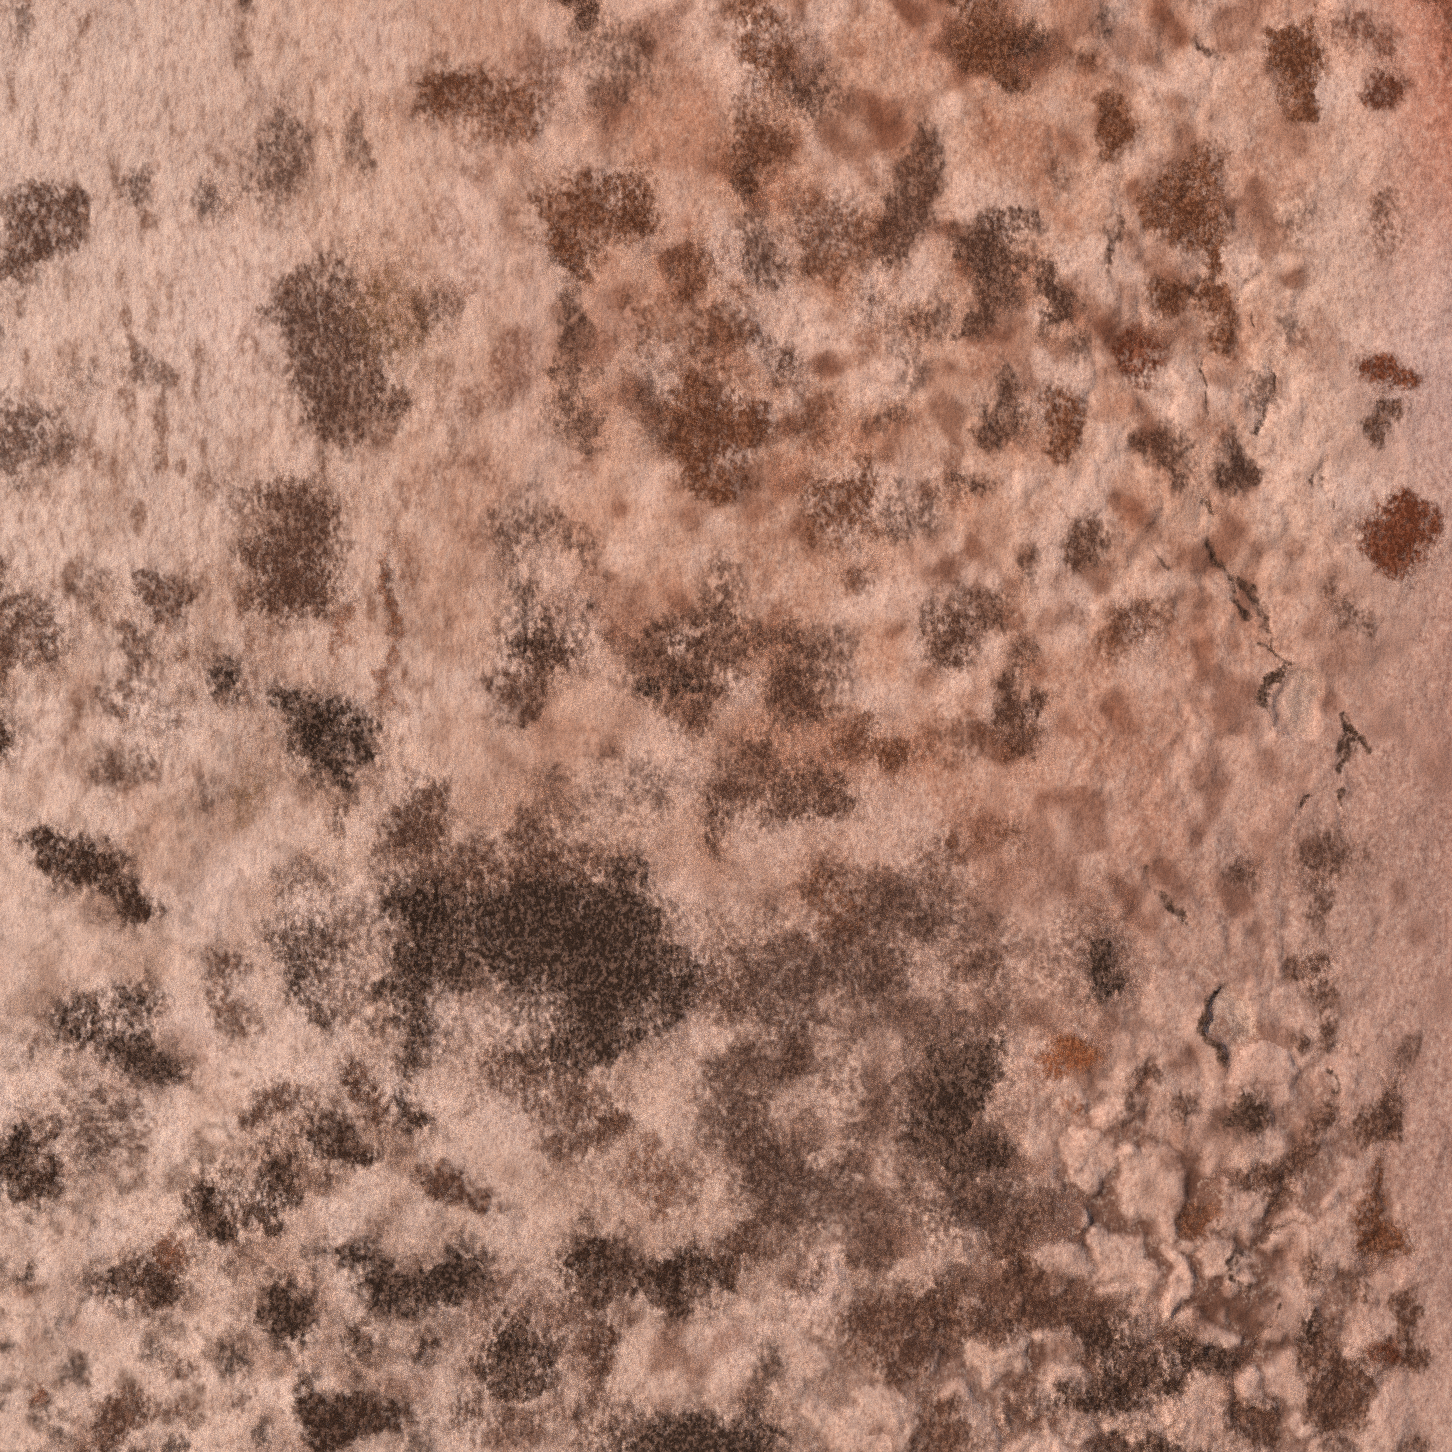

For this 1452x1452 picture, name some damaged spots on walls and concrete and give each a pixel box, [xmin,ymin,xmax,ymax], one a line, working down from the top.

damp [875,120,1089,385]
damp [256,250,412,452]
crack [1253,372,1276,435]
damp [624,560,856,736]
crack [1201,499,1286,663]
rust [1358,487,1444,580]
damp [268,685,382,835]
crack [1300,711,1371,807]
damp [18,825,164,923]
crack [1144,865,1186,922]
damp [0,983,183,1211]
damp [184,779,1239,1452]